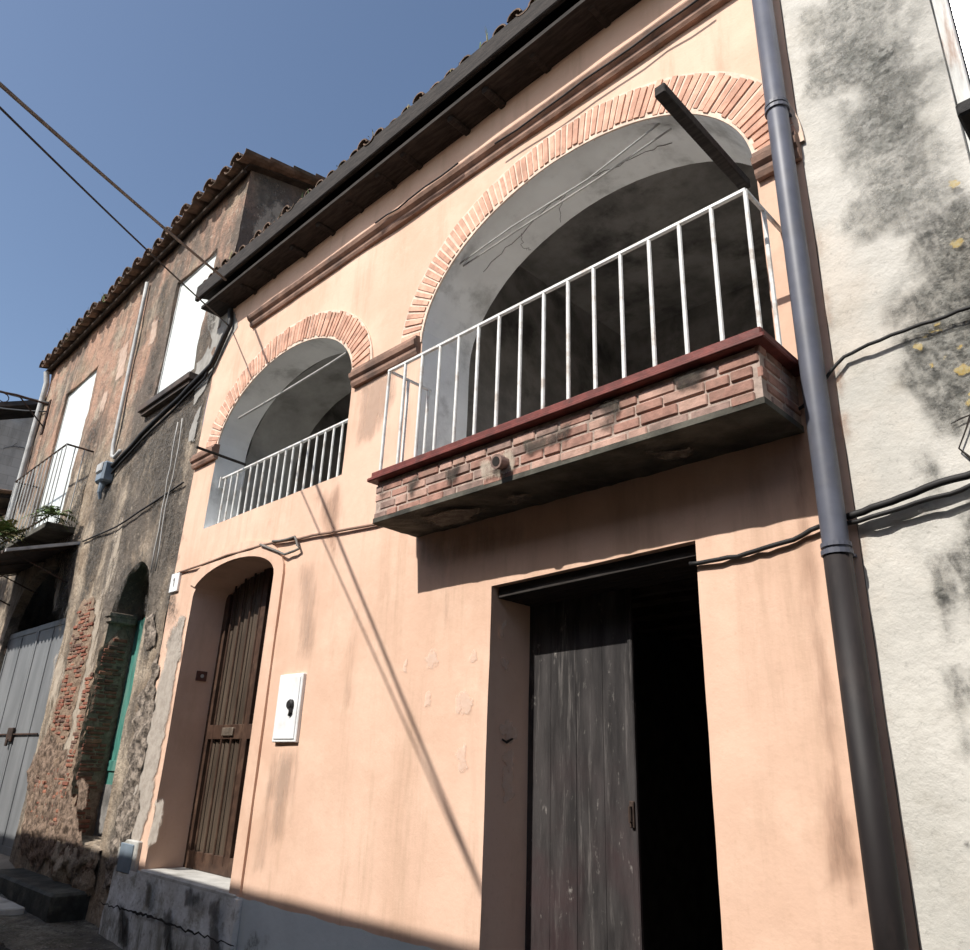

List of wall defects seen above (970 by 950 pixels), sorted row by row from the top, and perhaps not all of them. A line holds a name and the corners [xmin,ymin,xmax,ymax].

leakage [254,203,283,235]
leakage [800,0,970,431]
leakage [52,419,96,629]
leakage [64,384,209,759]
leakage [933,516,970,604]
flaking render [18,596,185,892]
leakage [118,905,128,947]
crack [101,902,234,949]
leakage [163,911,172,950]
leakage [184,889,220,950]